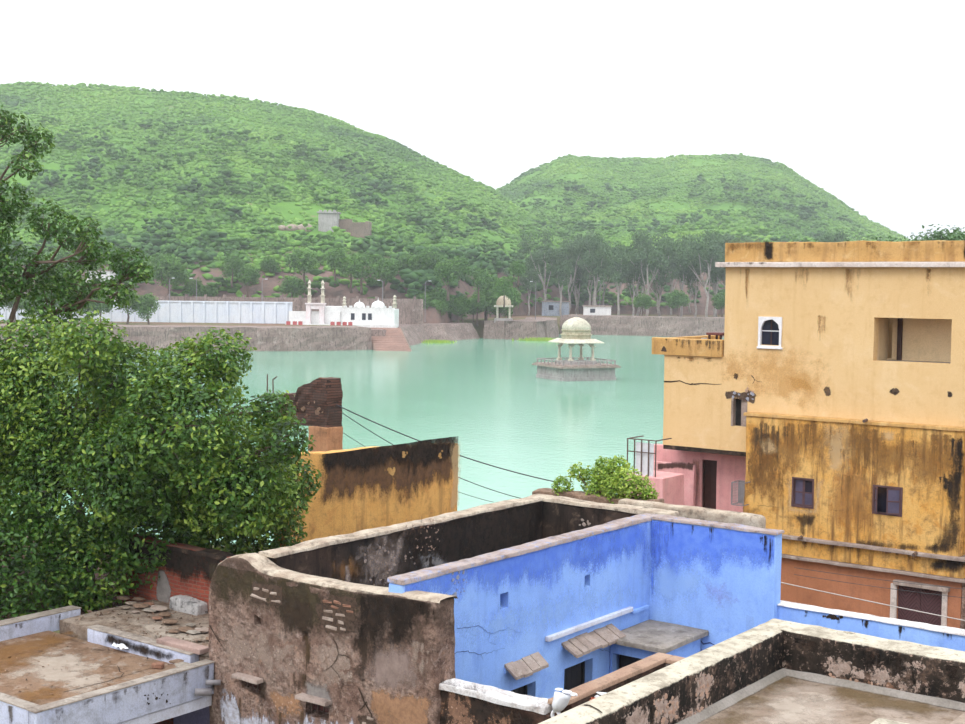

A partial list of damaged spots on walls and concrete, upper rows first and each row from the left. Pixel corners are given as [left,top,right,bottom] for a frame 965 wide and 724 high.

damp [728,241,773,264]
crack [664,378,717,386]
damp [322,436,458,504]
damp [748,423,817,502]
damp [929,435,965,572]
damp [852,541,920,558]
spalling [315,594,357,633]
crack [456,625,519,656]
peeling [371,640,416,688]
peeling [823,656,926,693]
peeling [270,691,303,718]
spalling [358,714,375,724]